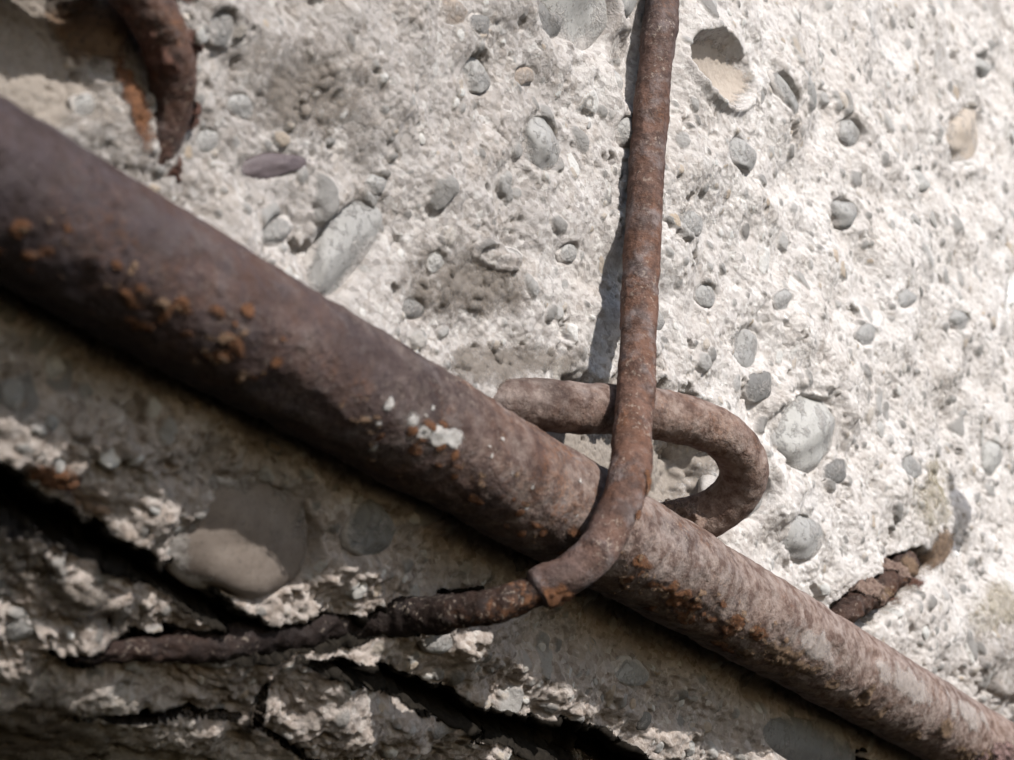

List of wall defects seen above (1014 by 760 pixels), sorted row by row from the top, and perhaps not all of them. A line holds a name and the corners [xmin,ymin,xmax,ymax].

rust [41,0,156,151]
rust [25,464,111,516]
spalling [546,432,612,469]
spalling [647,440,719,502]
rust [908,528,954,589]
crack [0,460,649,760]
spalling [858,555,925,626]
crack [855,747,868,760]